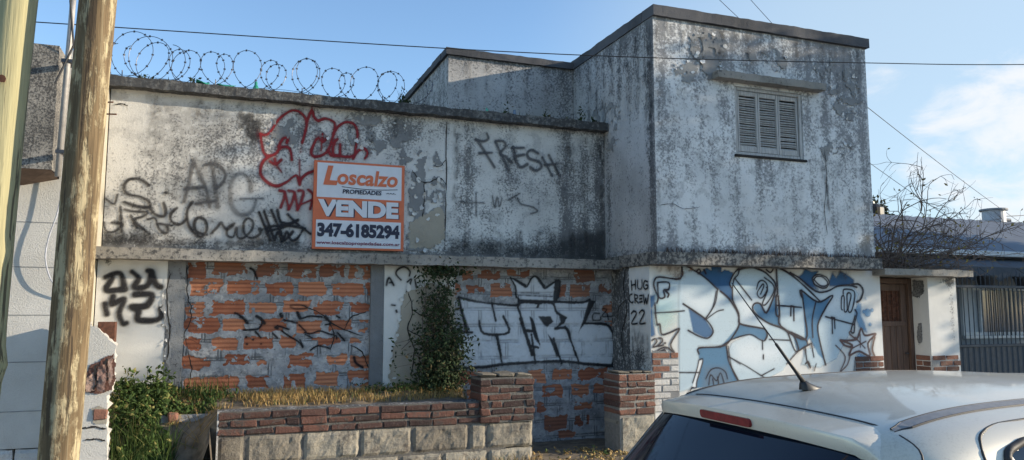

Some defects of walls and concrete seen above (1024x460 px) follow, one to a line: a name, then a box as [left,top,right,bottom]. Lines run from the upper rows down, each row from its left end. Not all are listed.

peeling [674,29,729,84]
leakage [241,114,260,140]
peeling [347,111,446,253]
leakage [105,235,152,243]
spalling [85,354,116,424]
spalling [651,350,680,412]